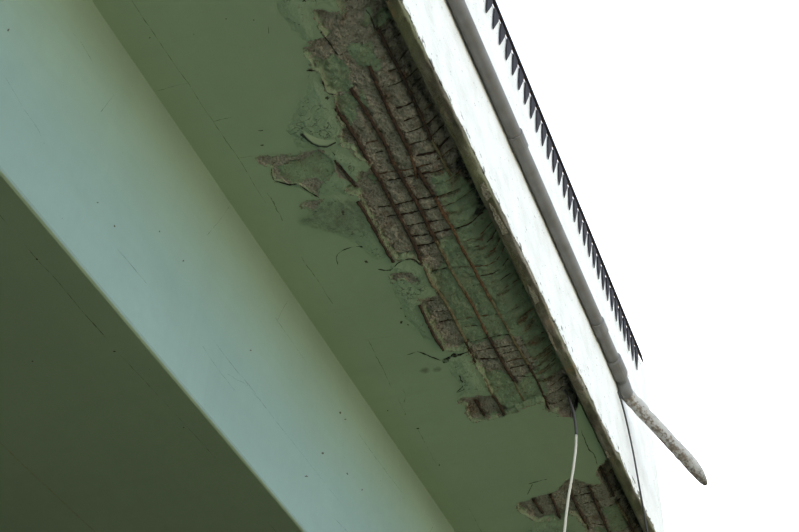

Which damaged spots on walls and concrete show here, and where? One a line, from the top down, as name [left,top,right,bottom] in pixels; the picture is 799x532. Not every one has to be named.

crack [214,118,318,221]
spalling [255,0,577,423]
spalling [516,451,643,532]